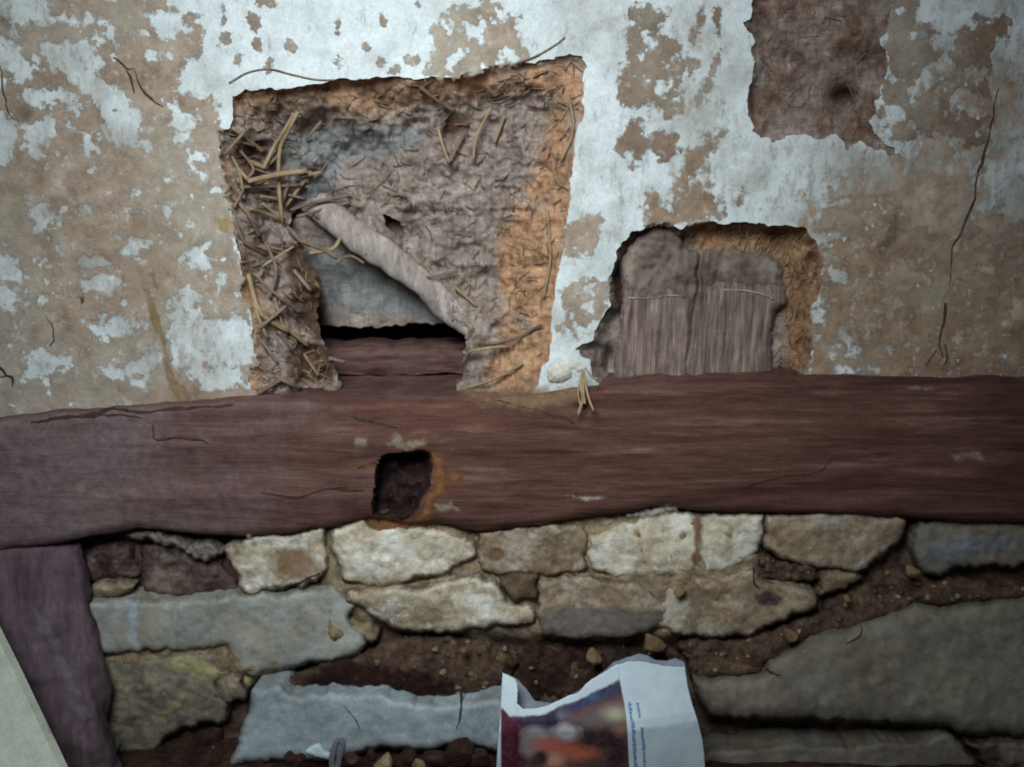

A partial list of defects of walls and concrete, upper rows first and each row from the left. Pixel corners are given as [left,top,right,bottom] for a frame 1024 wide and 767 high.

spalling [0,0,1024,417]
crack [926,87,999,367]
crack [31,404,233,445]
corrosion [369,454,462,531]